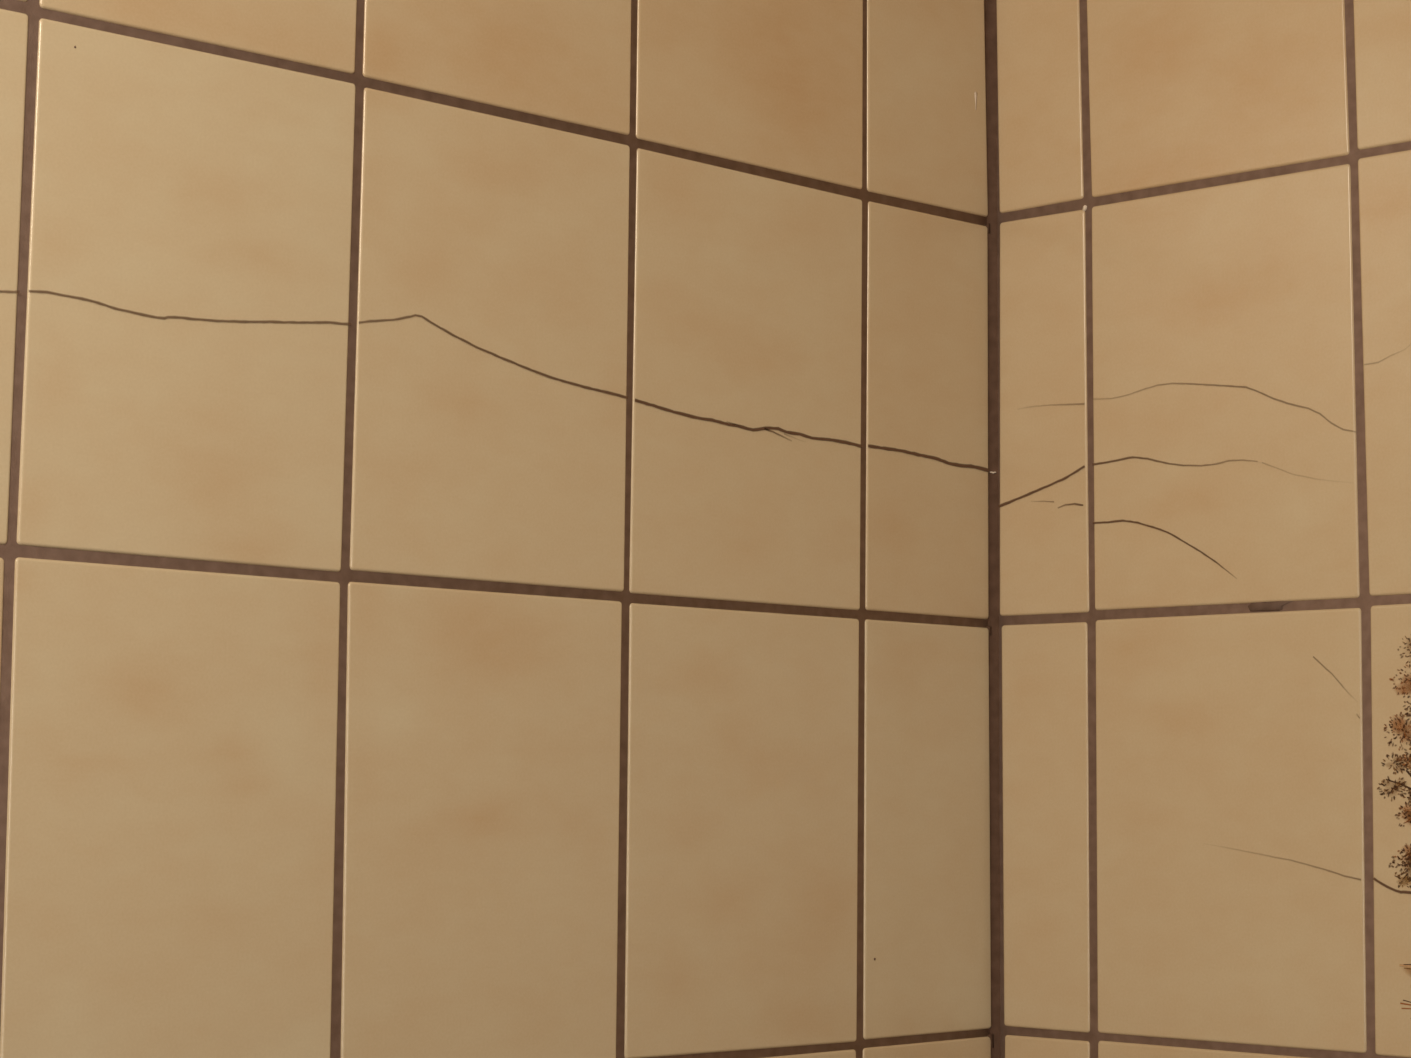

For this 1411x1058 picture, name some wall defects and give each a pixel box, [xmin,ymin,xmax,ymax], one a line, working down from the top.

crack [0,290,989,472]
crack [999,456,1223,568]